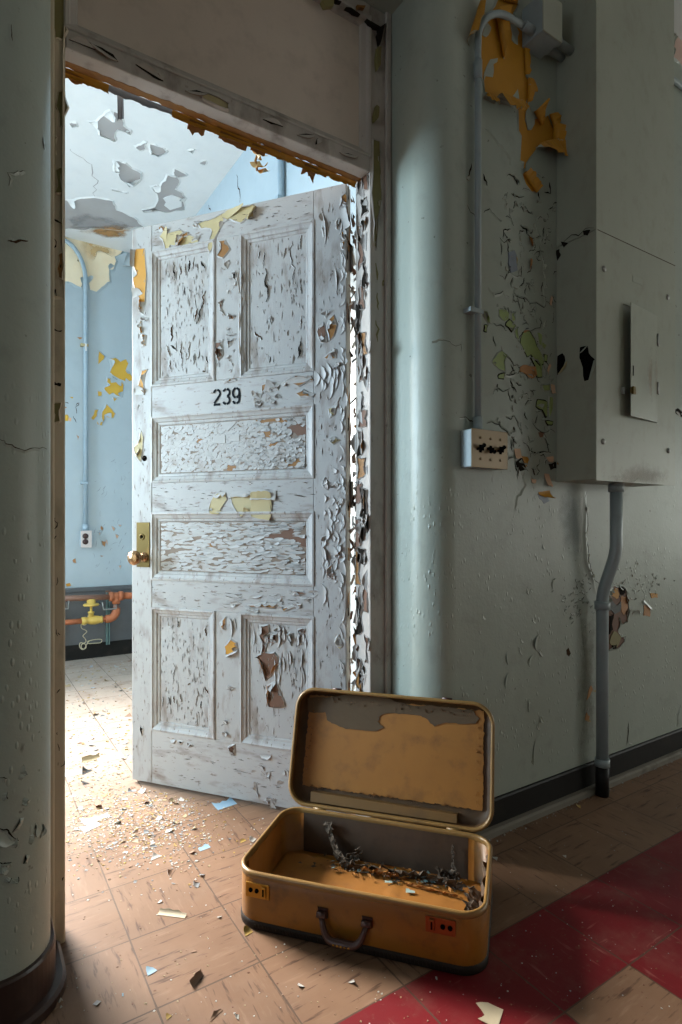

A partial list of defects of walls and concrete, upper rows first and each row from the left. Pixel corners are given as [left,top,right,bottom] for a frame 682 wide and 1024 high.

peeling [468,0,568,193]
peeling [54,0,386,708]
peeling [483,309,567,437]
crack [0,439,47,454]
peeling [514,449,559,504]
peeling [609,567,675,651]
peeling [221,721,236,756]
peeling [0,797,47,884]